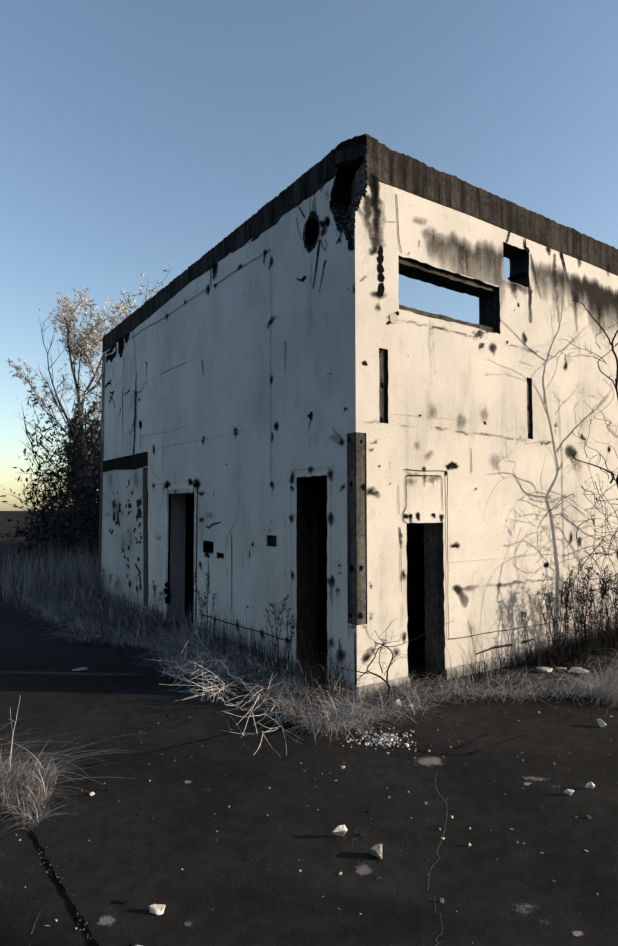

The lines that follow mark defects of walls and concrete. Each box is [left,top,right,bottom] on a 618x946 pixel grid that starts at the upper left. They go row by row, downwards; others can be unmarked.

spalling [329,143,367,251]
damp [359,172,384,248]
damp [425,230,618,325]
crack [395,733,526,946]